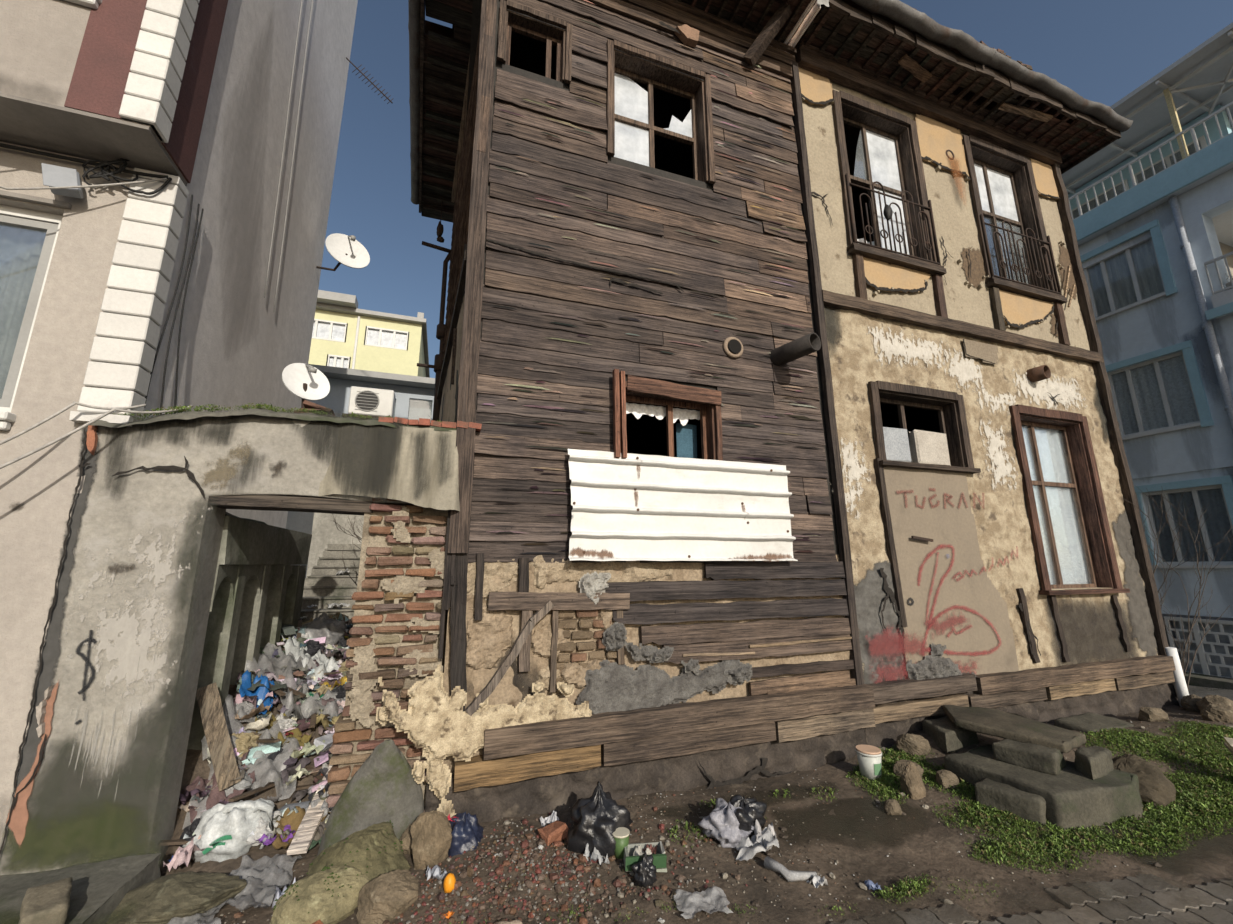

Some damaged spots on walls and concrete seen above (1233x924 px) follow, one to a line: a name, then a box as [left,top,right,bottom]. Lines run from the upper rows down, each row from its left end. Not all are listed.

peeling [863,257,930,297]
peeling [999,241,1077,338]
damp [302,414,401,498]
damp [416,434,425,496]
peeling [840,437,871,518]
peeling [867,325,1087,490]
crack [0,426,205,855]
peeling [69,507,209,799]
damp [178,504,206,619]
flaking render [854,561,908,684]
peeling [6,682,59,846]
damp [6,634,189,870]